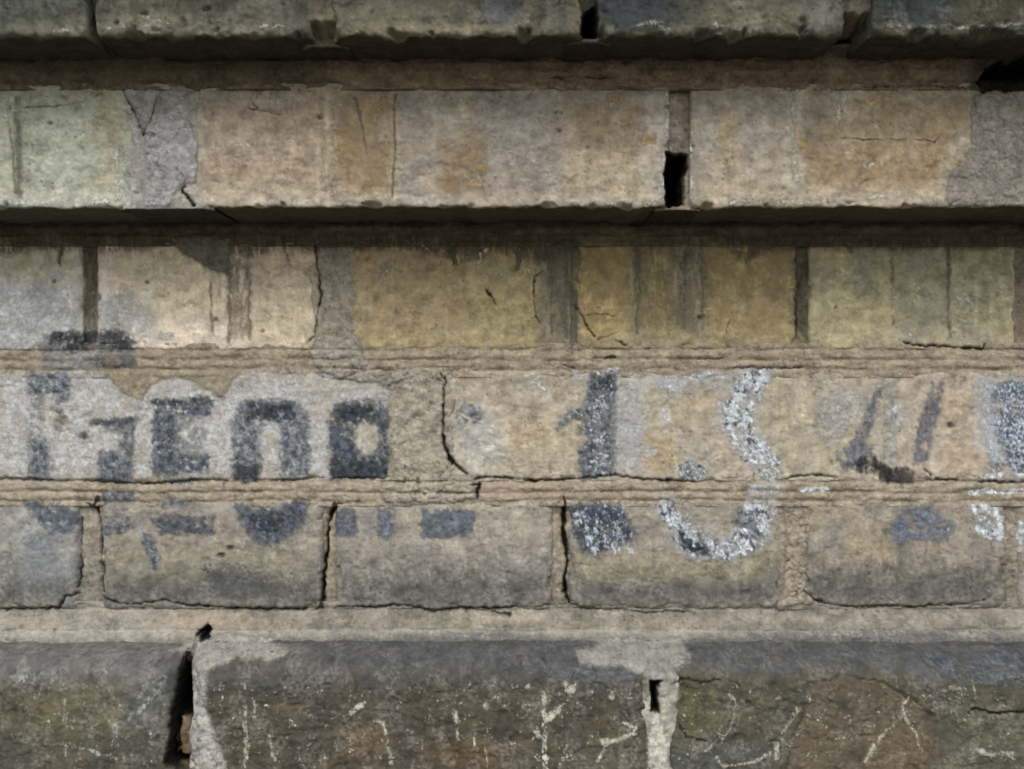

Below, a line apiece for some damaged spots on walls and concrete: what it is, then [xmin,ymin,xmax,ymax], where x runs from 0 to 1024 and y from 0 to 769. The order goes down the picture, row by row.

crack [126,97,155,136]
crack [181,186,196,207]
crack [904,342,985,350]
crack [440,372,694,614]
crack [0,477,513,616]